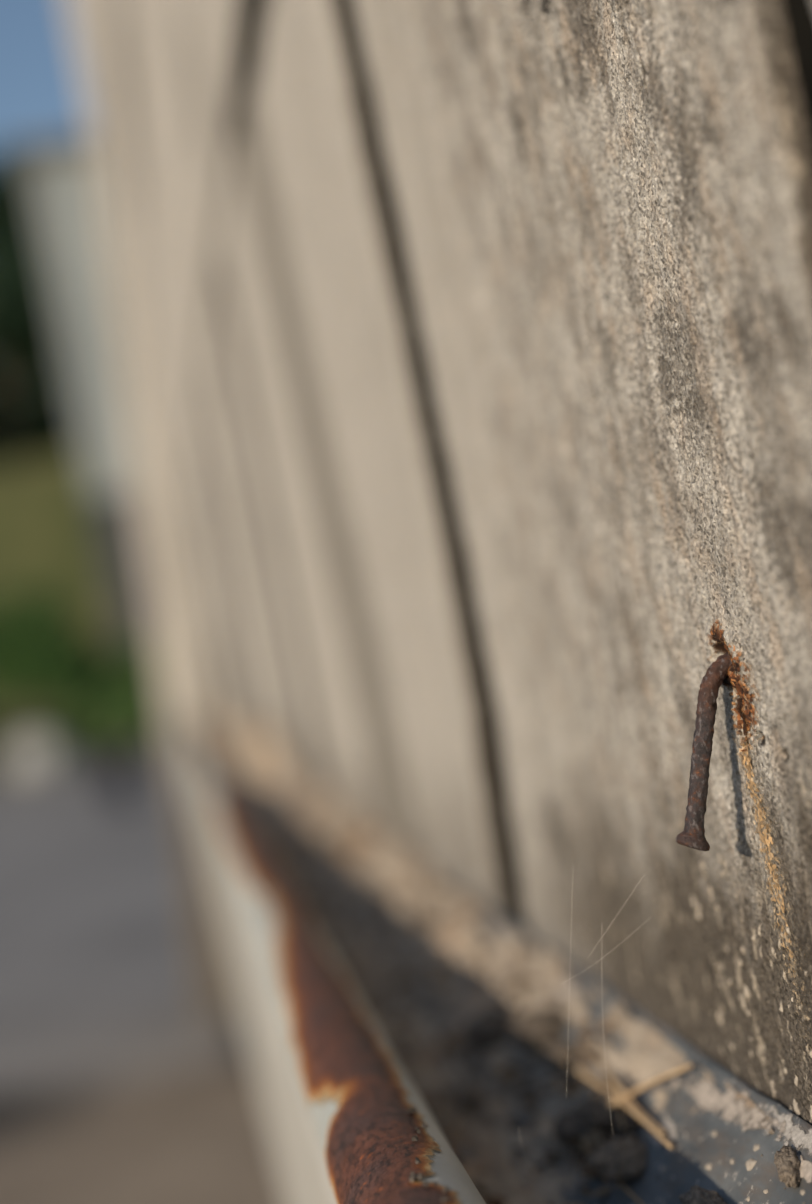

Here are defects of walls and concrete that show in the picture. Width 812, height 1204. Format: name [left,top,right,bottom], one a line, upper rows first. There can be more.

corrosion [213,789,485,1204]
corrosion [707,620,795,977]